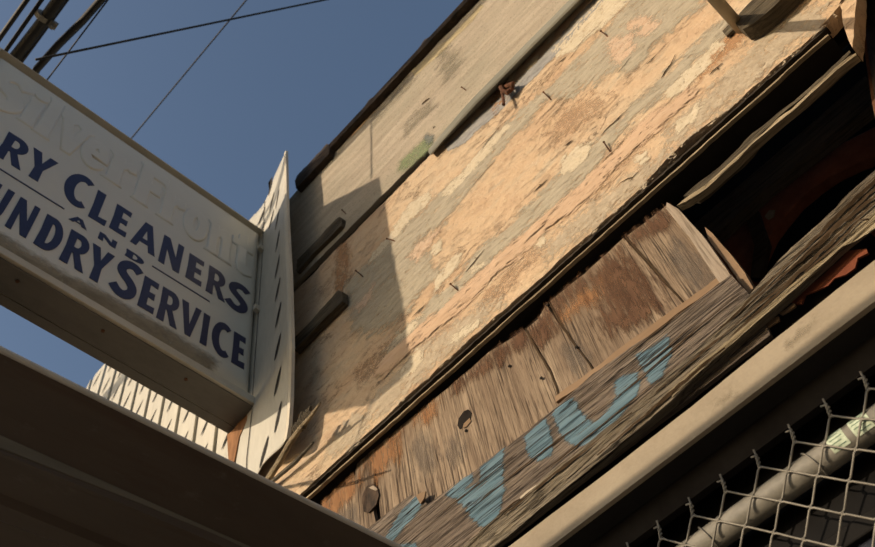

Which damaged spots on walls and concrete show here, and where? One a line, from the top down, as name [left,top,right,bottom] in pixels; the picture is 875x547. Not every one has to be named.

peeling [324,0,838,463]